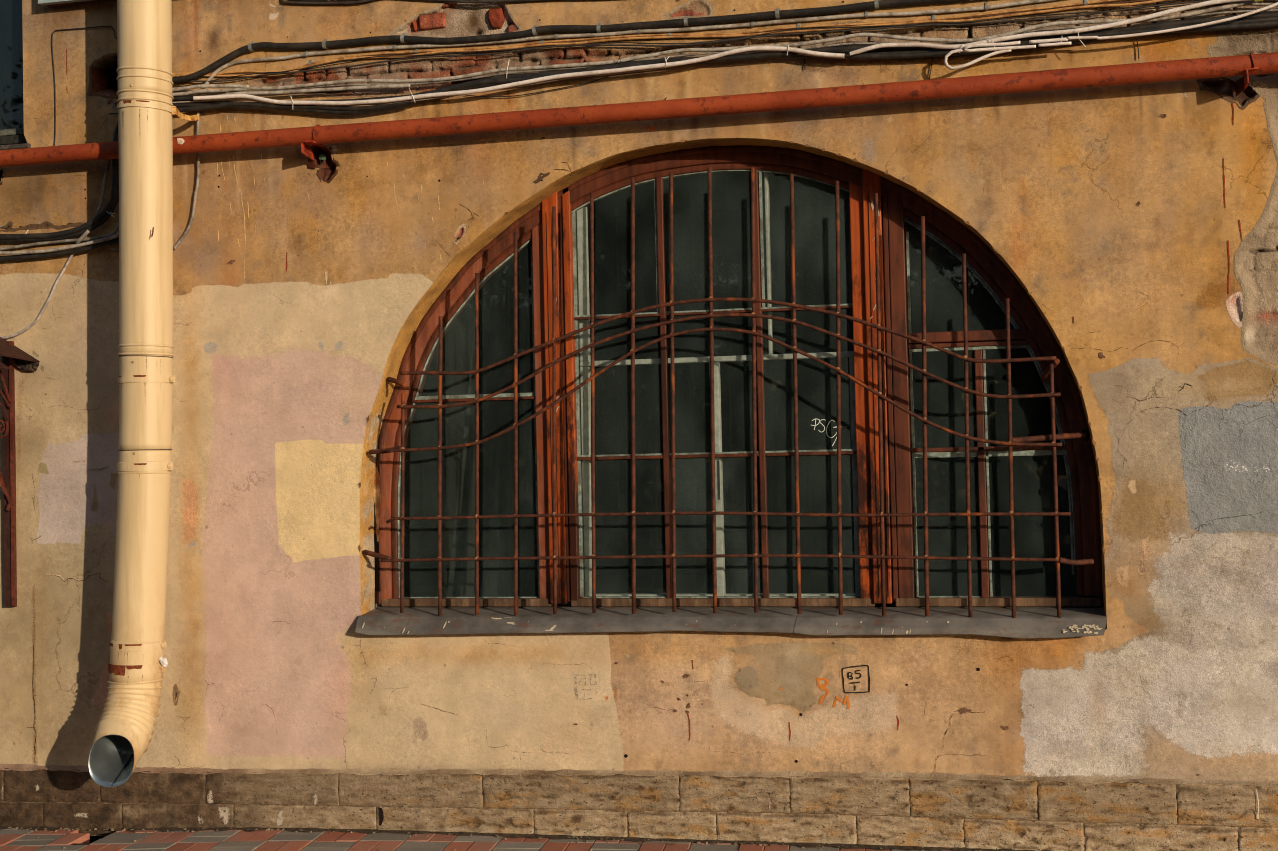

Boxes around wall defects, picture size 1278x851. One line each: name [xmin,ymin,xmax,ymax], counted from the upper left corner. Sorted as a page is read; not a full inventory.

spalling [87,52,118,112]
spalling [241,0,1278,99]
flaking render [1021,73,1278,783]